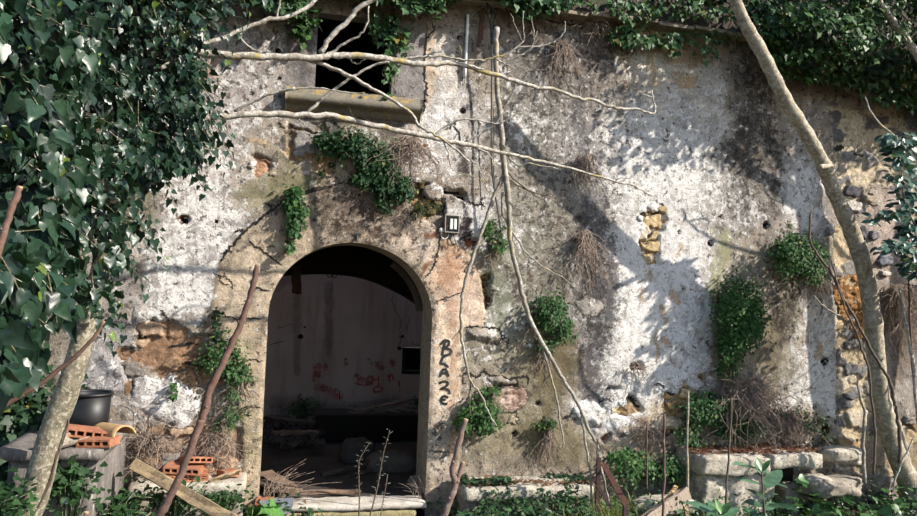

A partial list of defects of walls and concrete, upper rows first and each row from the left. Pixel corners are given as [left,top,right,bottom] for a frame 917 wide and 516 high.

flaking render [247,155,276,178]
flaking render [278,119,355,185]
crack [213,180,347,289]
flaking render [637,201,667,304]
flaking render [116,318,232,397]
crack [464,325,510,345]
crack [461,368,530,384]
flaking render [612,393,640,417]